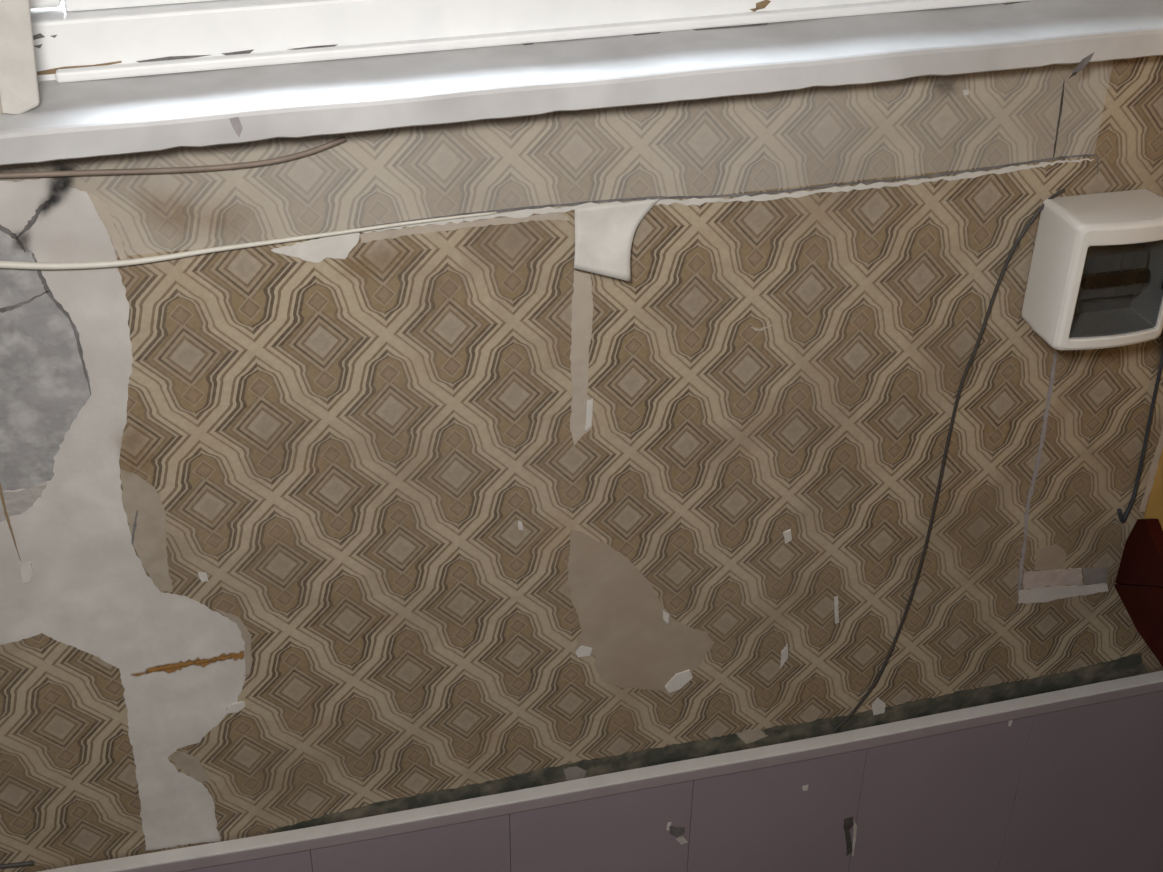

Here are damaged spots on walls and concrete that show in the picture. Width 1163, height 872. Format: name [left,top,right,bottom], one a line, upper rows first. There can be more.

spalling [0,231,91,522]
peeling [584,398,593,431]
rust [133,651,244,676]
peeling [575,646,592,657]
peeling [226,701,245,713]